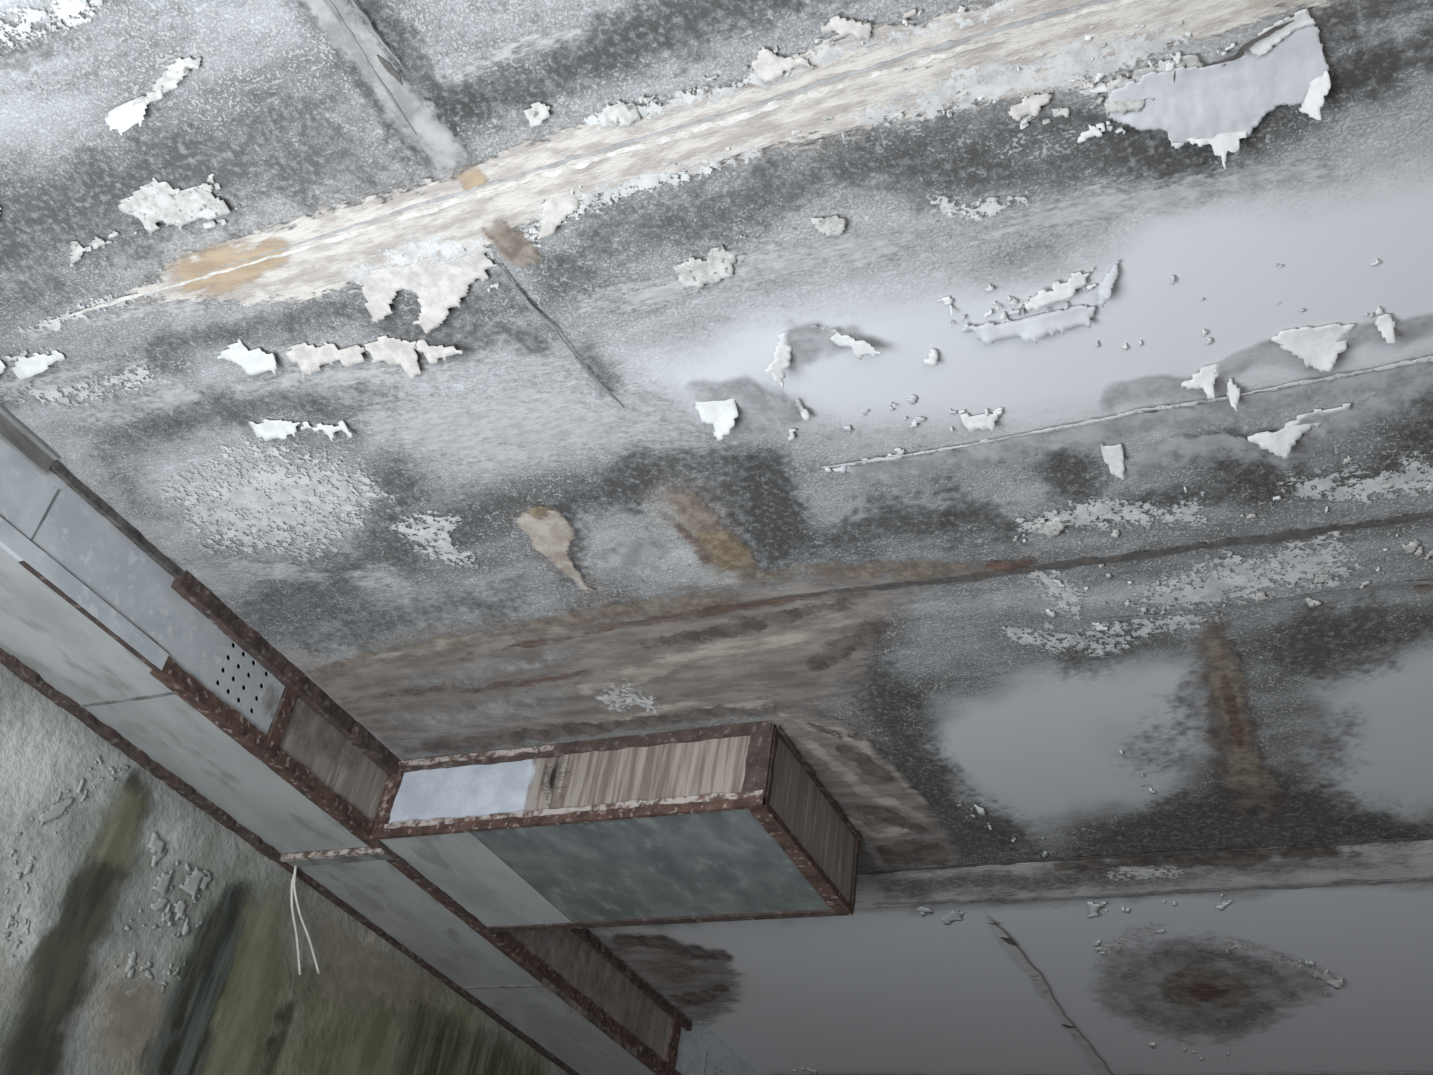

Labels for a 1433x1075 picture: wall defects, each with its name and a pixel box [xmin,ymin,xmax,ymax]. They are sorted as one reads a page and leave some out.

damp [0,96,382,338]
rust [175,239,287,294]
spalling [69,0,1332,381]
damp [574,230,917,312]
damp [546,105,1329,274]
peeling [248,419,353,441]
peeling [822,306,1433,482]
damp [0,275,1433,901]
peeling [1013,517,1075,543]
peeling [1360,534,1433,589]
rust [1190,621,1298,831]
damp [1093,923,1335,1046]